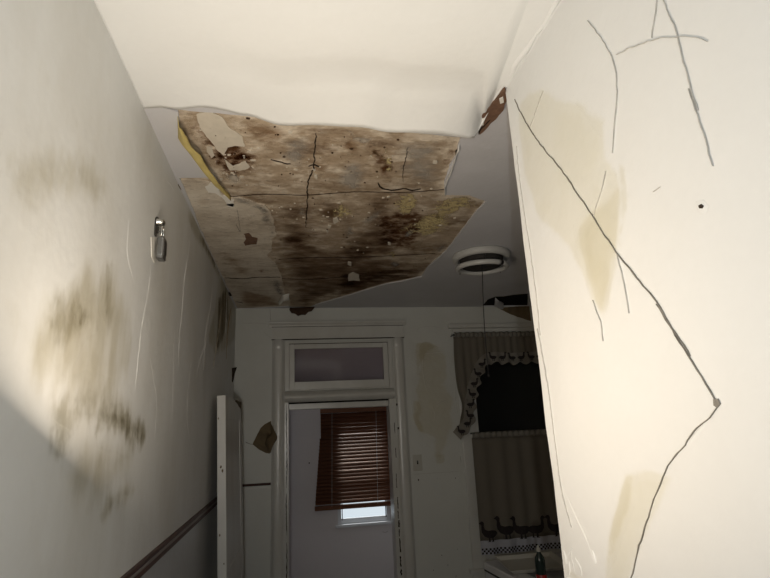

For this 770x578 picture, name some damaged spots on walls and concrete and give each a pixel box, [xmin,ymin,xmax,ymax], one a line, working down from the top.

flaking render [181,178,290,308]
flaking render [347,261,369,281]
crack [514,0,717,578]
flaking render [246,404,288,531]